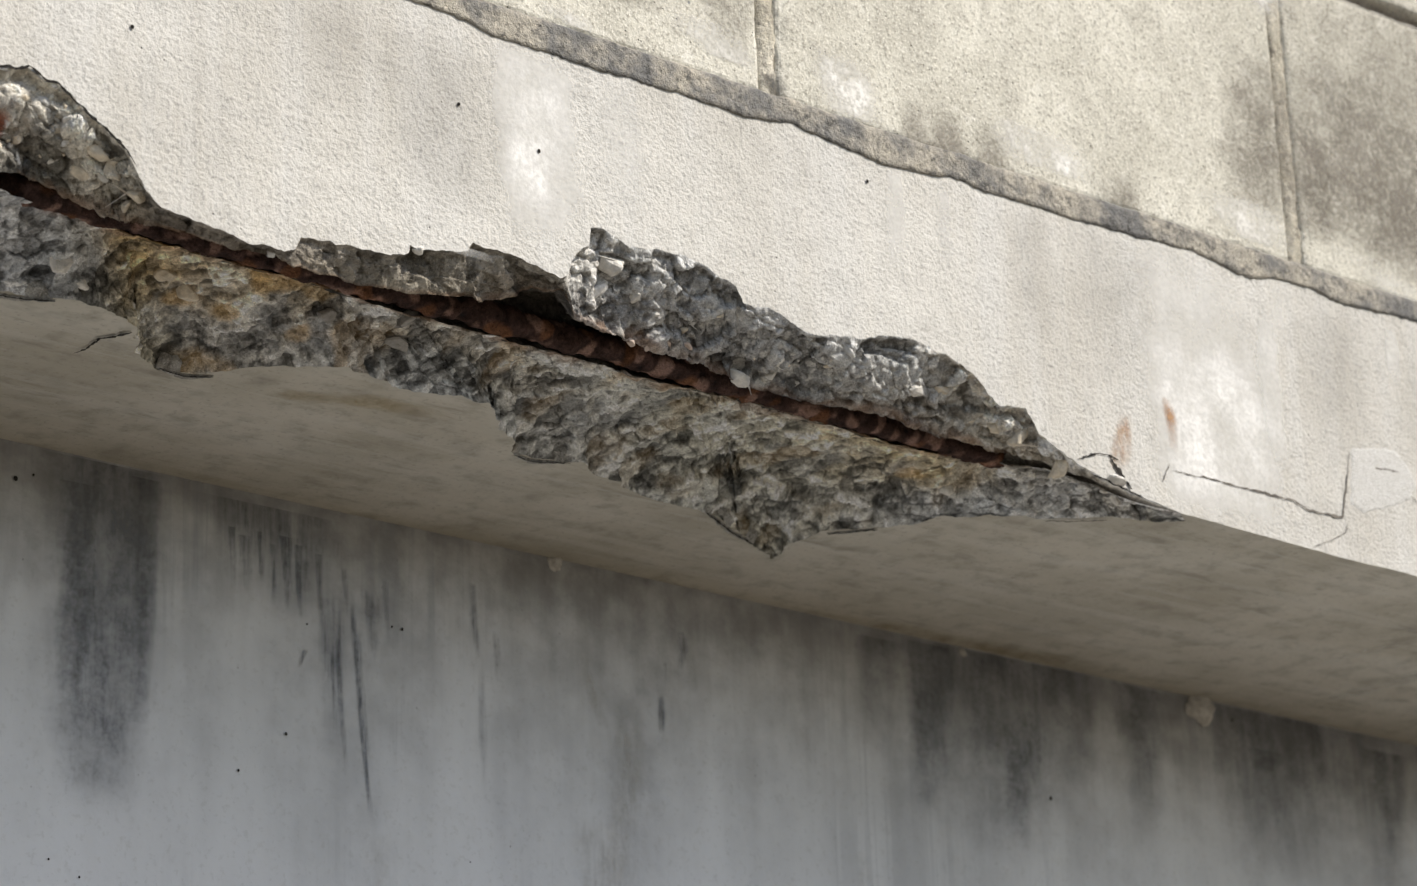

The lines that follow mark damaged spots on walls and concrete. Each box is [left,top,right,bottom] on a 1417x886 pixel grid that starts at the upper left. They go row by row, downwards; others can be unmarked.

crack [0,64,136,165]
spalling [0,68,1185,559]
damp [72,465,144,686]
efflorescence [1149,331,1284,515]
crack [1079,453,1416,547]